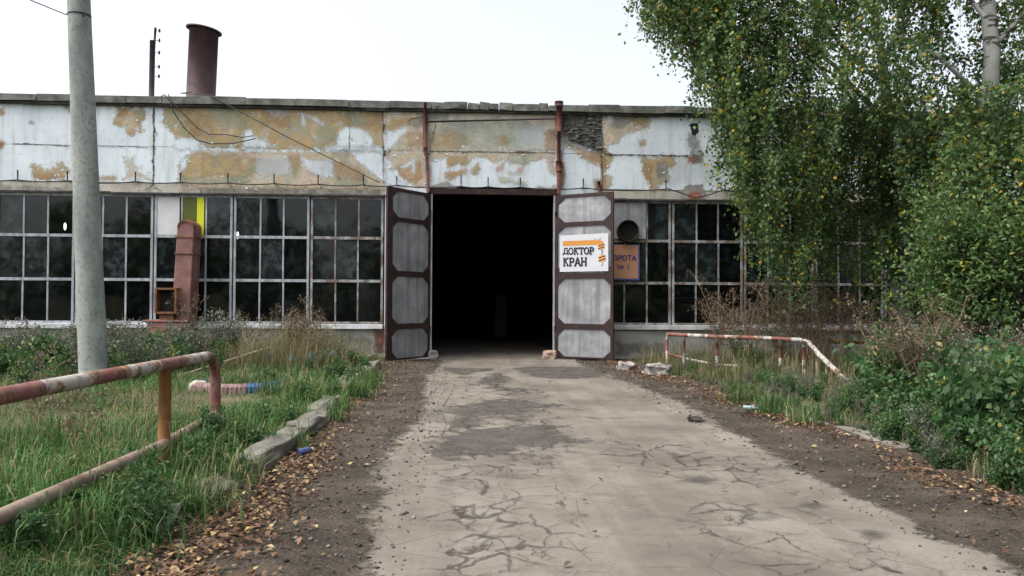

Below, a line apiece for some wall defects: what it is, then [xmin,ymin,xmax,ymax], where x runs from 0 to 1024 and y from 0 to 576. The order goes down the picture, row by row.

peeling [113,106,146,137]
peeling [159,107,699,192]
peeling [30,162,69,183]